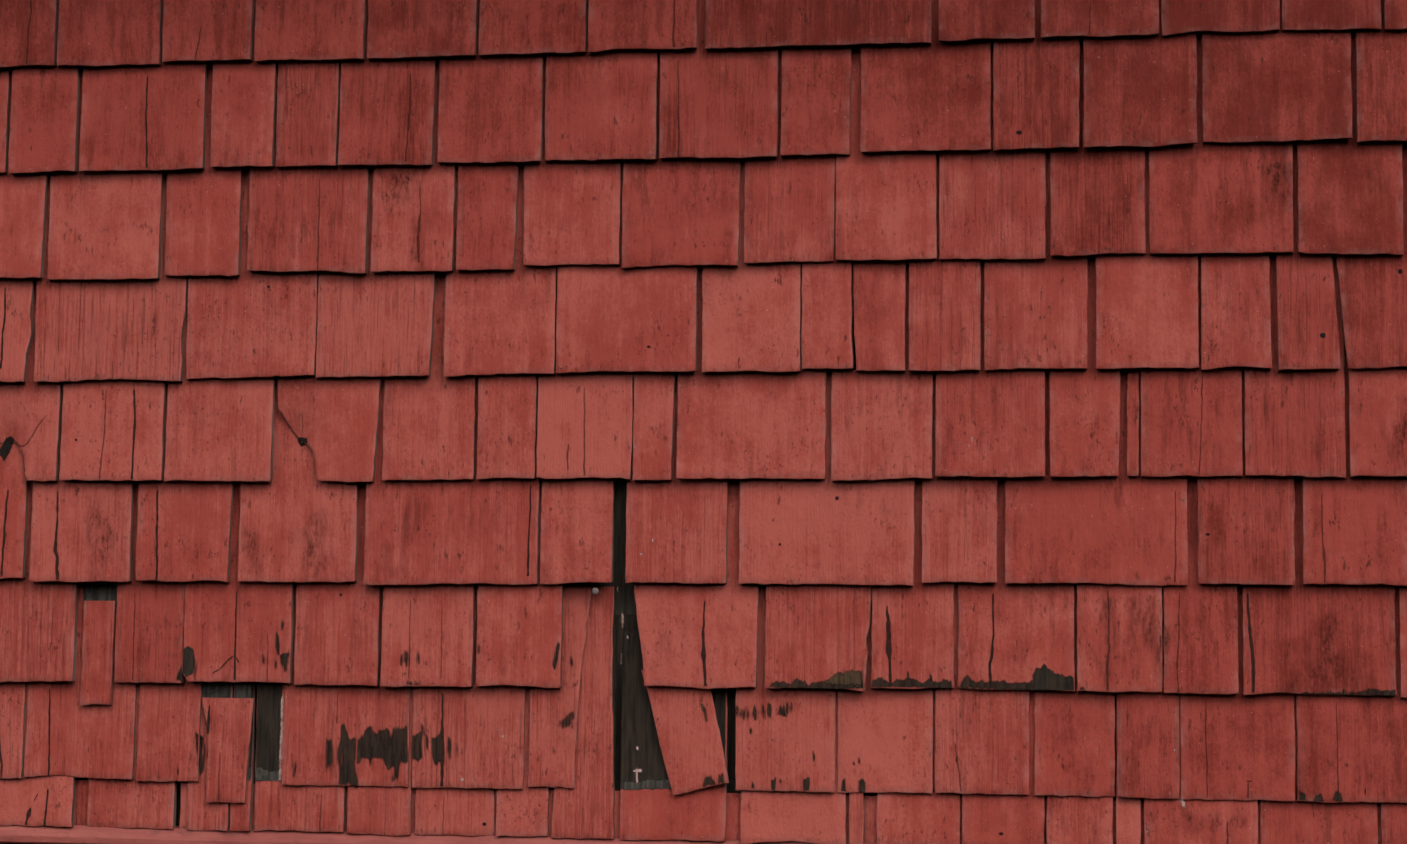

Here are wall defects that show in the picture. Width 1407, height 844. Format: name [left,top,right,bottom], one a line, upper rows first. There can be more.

crack [0,288,8,369]
crack [280,412,303,439]
crack [0,415,47,576]
crack [52,492,60,580]
peeling [177,621,296,781]
peeling [326,724,458,788]
peeling [612,615,672,790]
peeling [701,664,1086,792]